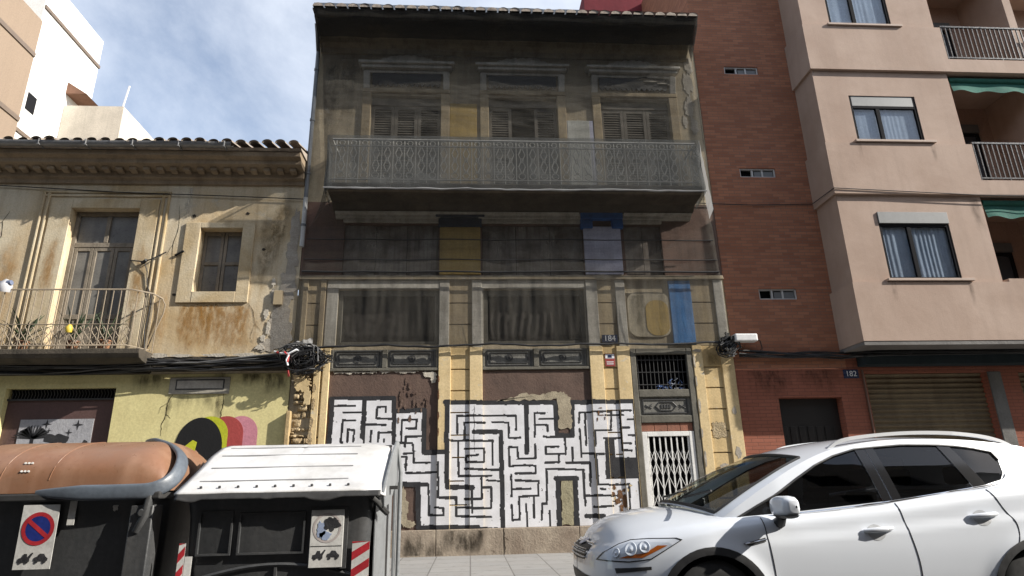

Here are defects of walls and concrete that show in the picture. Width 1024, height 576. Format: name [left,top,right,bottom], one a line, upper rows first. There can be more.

flaking render [151,208,301,358]
spalling [292,371,311,405]
spalling [333,371,440,435]
spalling [498,391,573,429]